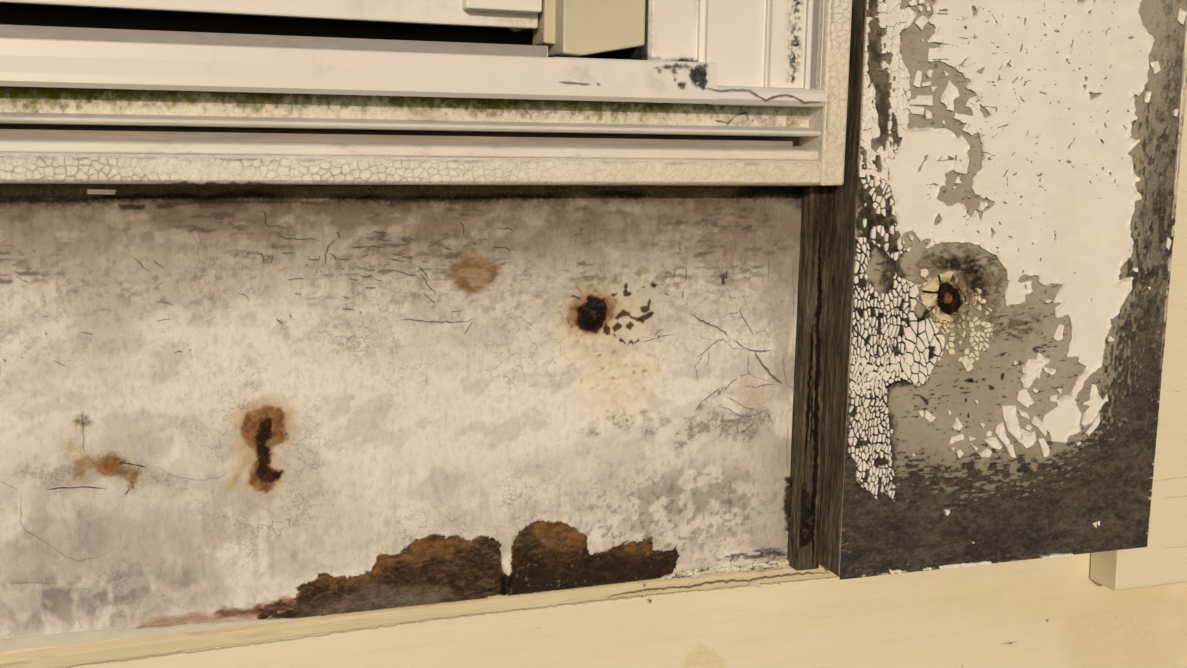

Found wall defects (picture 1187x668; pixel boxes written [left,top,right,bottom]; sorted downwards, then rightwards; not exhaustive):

damp [632,47,708,89]
damp [790,0,802,82]
peeling [1172,6,1187,118]
peeling [859,0,1160,458]
rust [452,257,498,292]
rust [567,282,668,344]
rust [41,453,144,495]
rust [242,407,287,492]
peeling [0,520,680,652]
peeling [922,561,992,570]